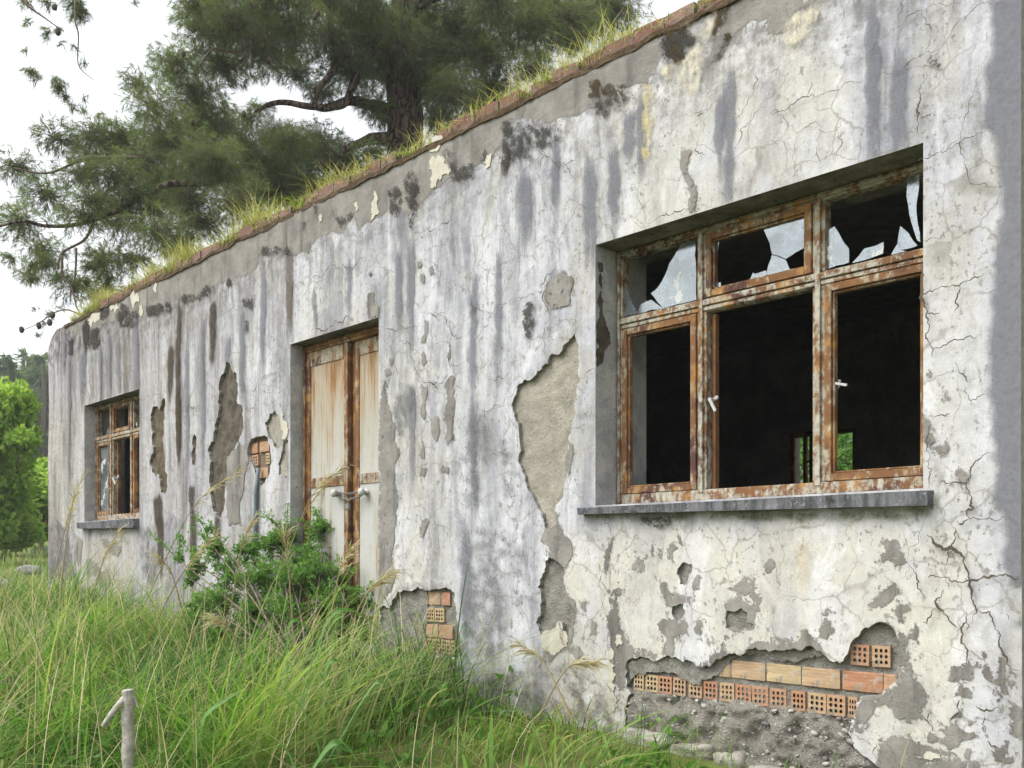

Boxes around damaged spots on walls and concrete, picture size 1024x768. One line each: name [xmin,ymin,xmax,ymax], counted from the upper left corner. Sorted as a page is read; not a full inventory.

peeling [56,37,666,339]
leakage [499,121,560,247]
leakage [582,79,652,259]
crack [676,0,1007,195]
leakage [522,301,534,338]
flaking render [152,400,168,493]
leakage [63,246,292,620]
flaking render [211,363,289,526]
flaking render [376,339,465,700]
flaking render [515,338,1021,768]
crack [901,413,1020,671]
crack [924,700,999,748]